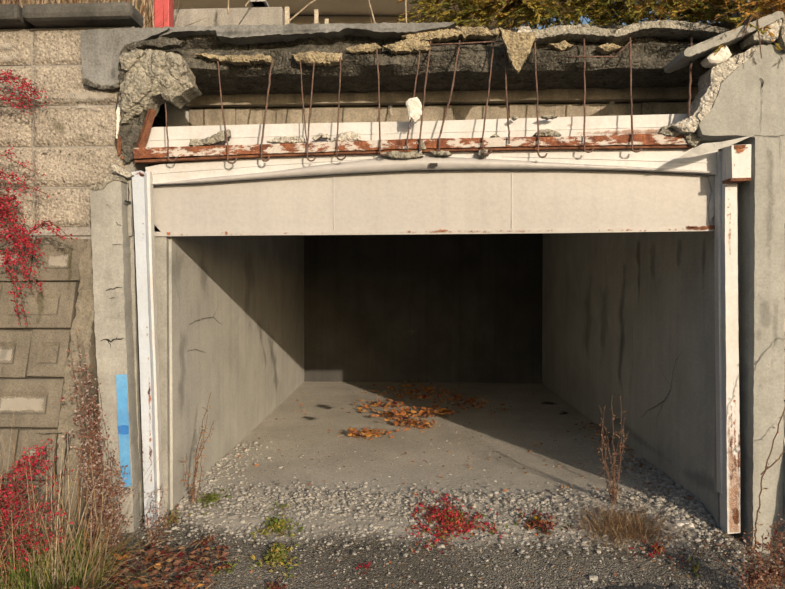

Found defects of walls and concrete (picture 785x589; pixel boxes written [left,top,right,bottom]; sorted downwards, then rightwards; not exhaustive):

spalling [195,53,274,66]
spalling [291,26,500,67]
spalling [517,20,730,54]
spalling [670,46,757,134]
peeling [677,136,751,159]
corrosion [728,400,741,532]